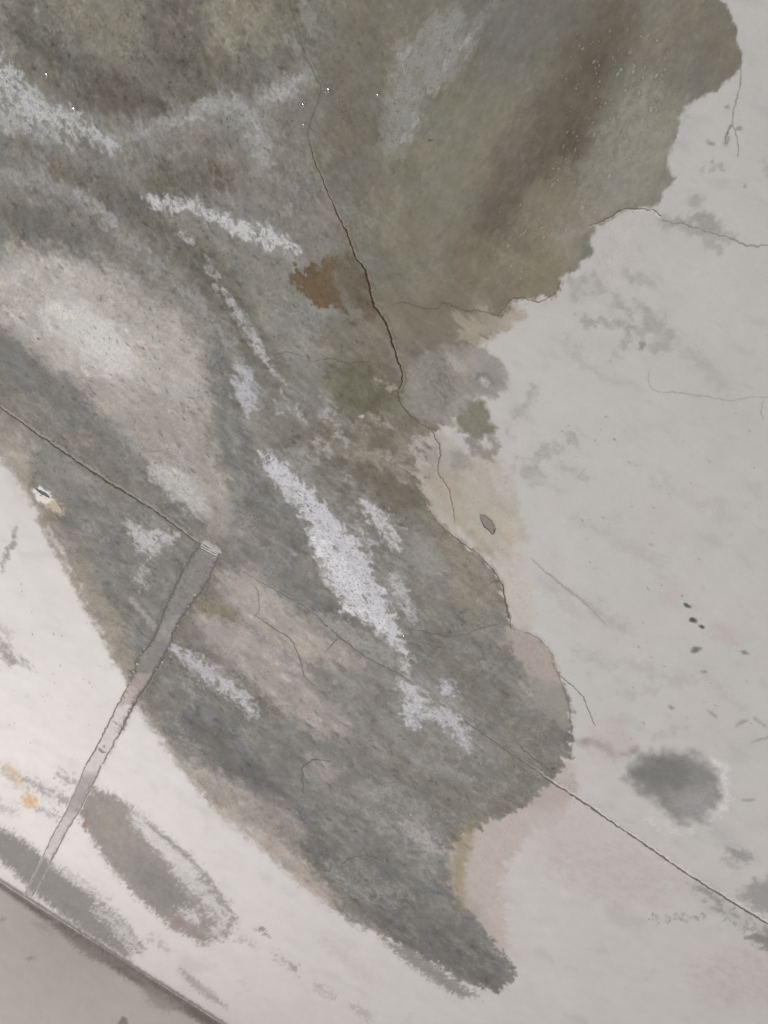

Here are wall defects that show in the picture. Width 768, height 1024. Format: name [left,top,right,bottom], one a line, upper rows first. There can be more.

crack [724,55,742,156]
rust [286,250,370,331]
crack [288,0,512,637]
crack [588,208,768,248]
crack [0,403,201,543]
leakage [357,404,401,440]
leakage [0,408,195,683]
leakage [645,580,701,615]
crack [219,554,768,925]
leakage [0,760,303,1016]
leakage [672,872,768,1024]
leakage [699,817,760,878]